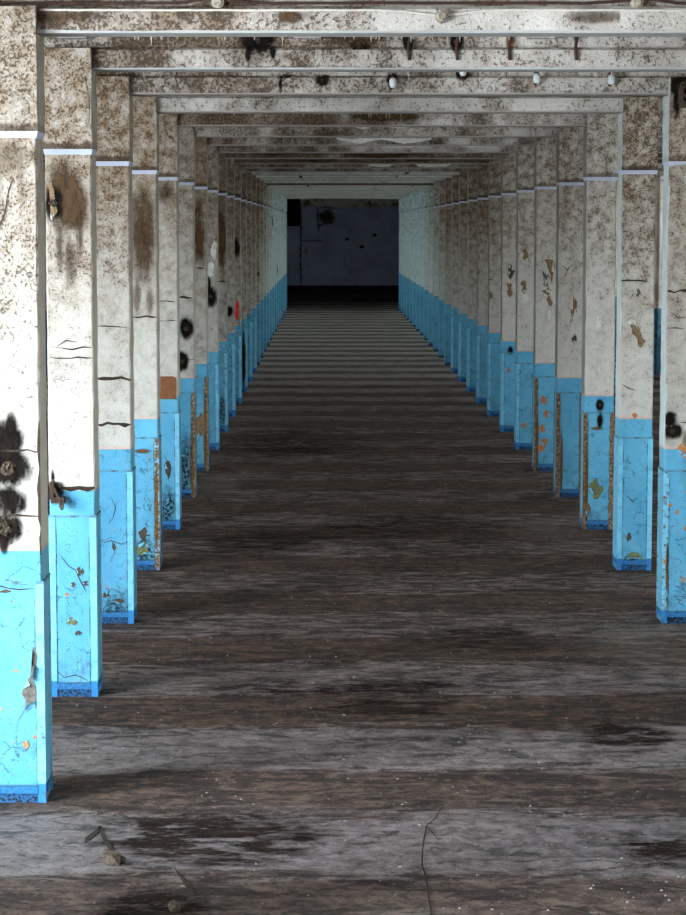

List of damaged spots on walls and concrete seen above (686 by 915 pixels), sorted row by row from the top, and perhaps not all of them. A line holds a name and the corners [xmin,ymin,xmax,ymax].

peeling [337,127,431,148]
water stain [51,164,87,278]
crack [667,273,686,329]
crack [50,296,192,381]
peeling [627,319,645,348]
crack [98,420,131,428]
crack [1,421,127,591]
peeling [585,478,604,518]
peeling [22,647,37,712]